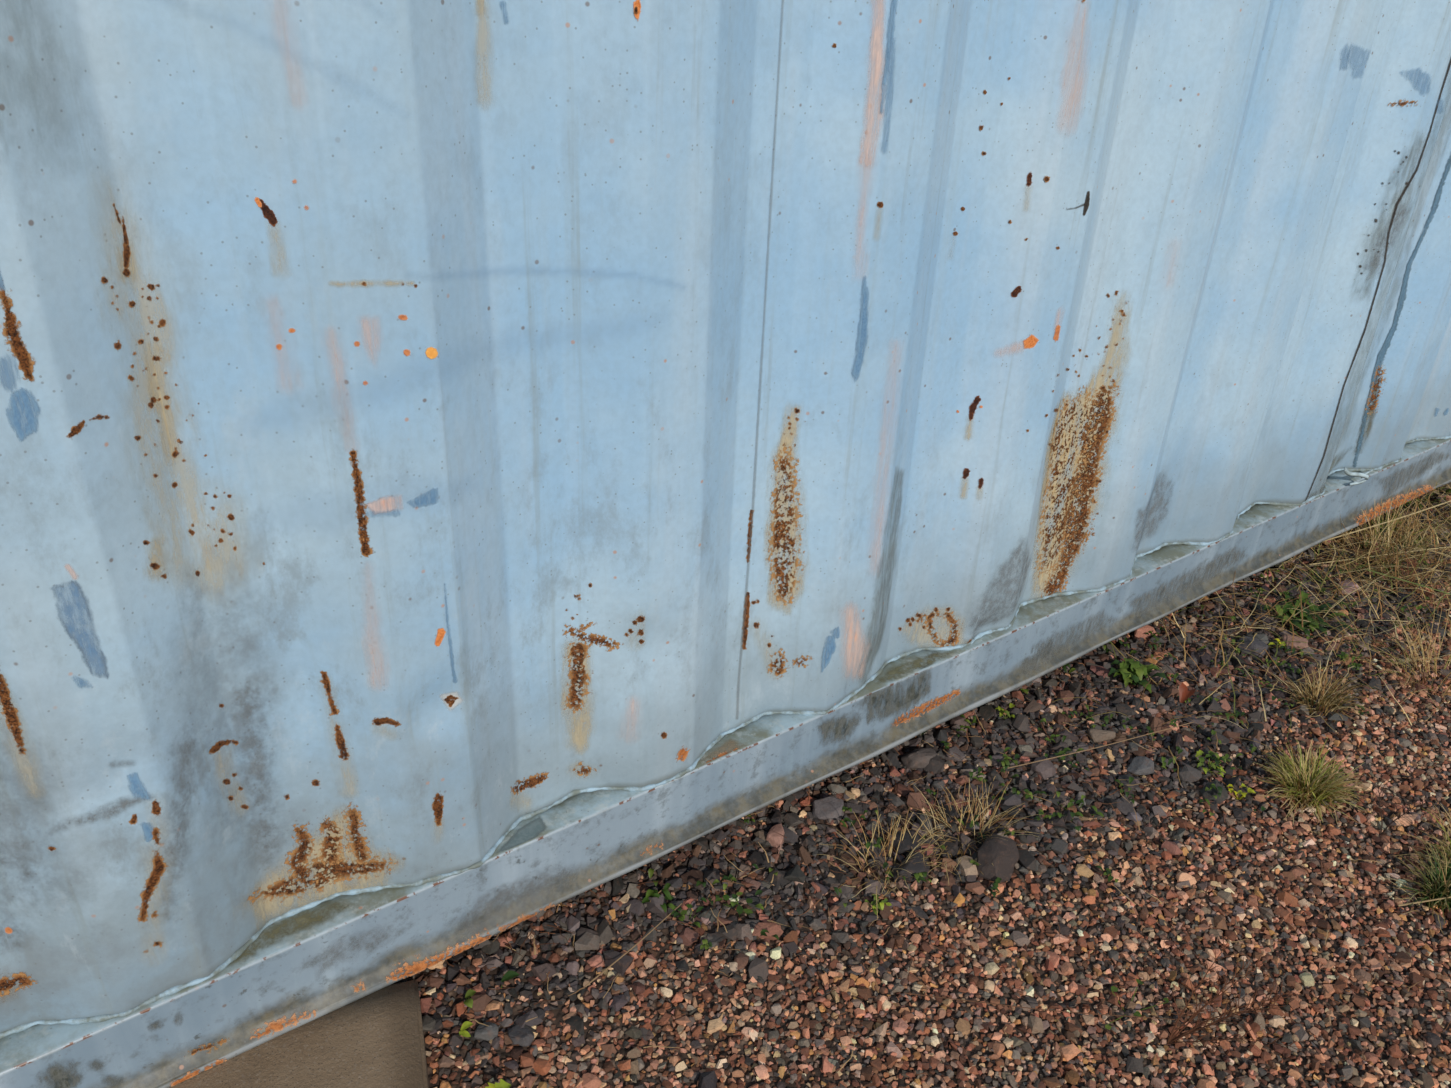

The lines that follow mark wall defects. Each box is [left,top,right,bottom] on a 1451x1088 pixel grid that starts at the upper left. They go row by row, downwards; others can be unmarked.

rust [0,288,35,381]
rust [101,203,237,586]
rust [349,450,373,557]
rust [742,408,805,650]
rust [1034,291,1127,597]
rust [898,607,972,647]
rust [0,674,35,792]
rust [320,671,350,760]
rust [129,773,168,922]
rust [248,783,396,918]